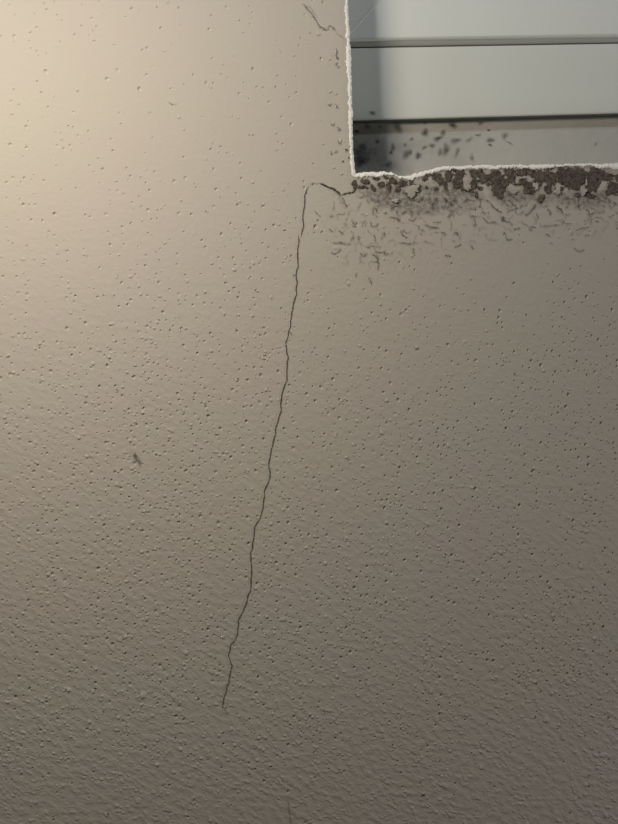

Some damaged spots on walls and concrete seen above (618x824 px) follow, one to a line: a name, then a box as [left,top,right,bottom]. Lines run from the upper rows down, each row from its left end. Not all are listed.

crack [222,183,618,707]